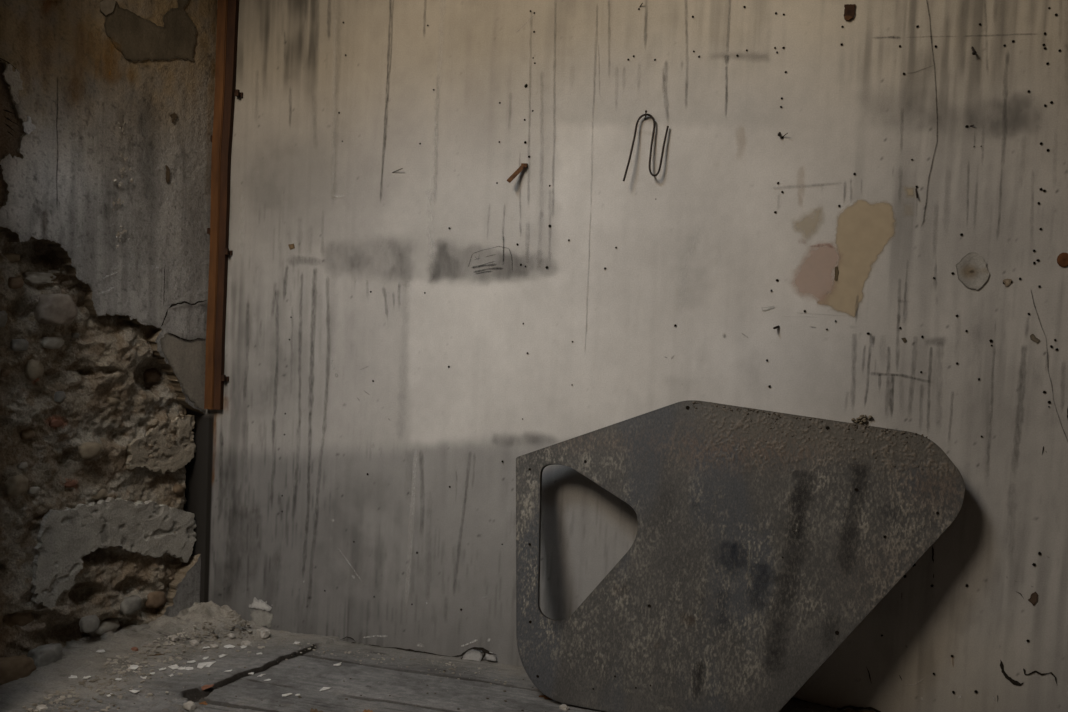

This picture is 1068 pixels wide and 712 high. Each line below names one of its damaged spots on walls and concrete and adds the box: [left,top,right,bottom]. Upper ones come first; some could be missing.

peeling [100,0,197,61]
spalling [0,63,36,206]
peeling [818,200,895,317]
spalling [0,228,206,686]